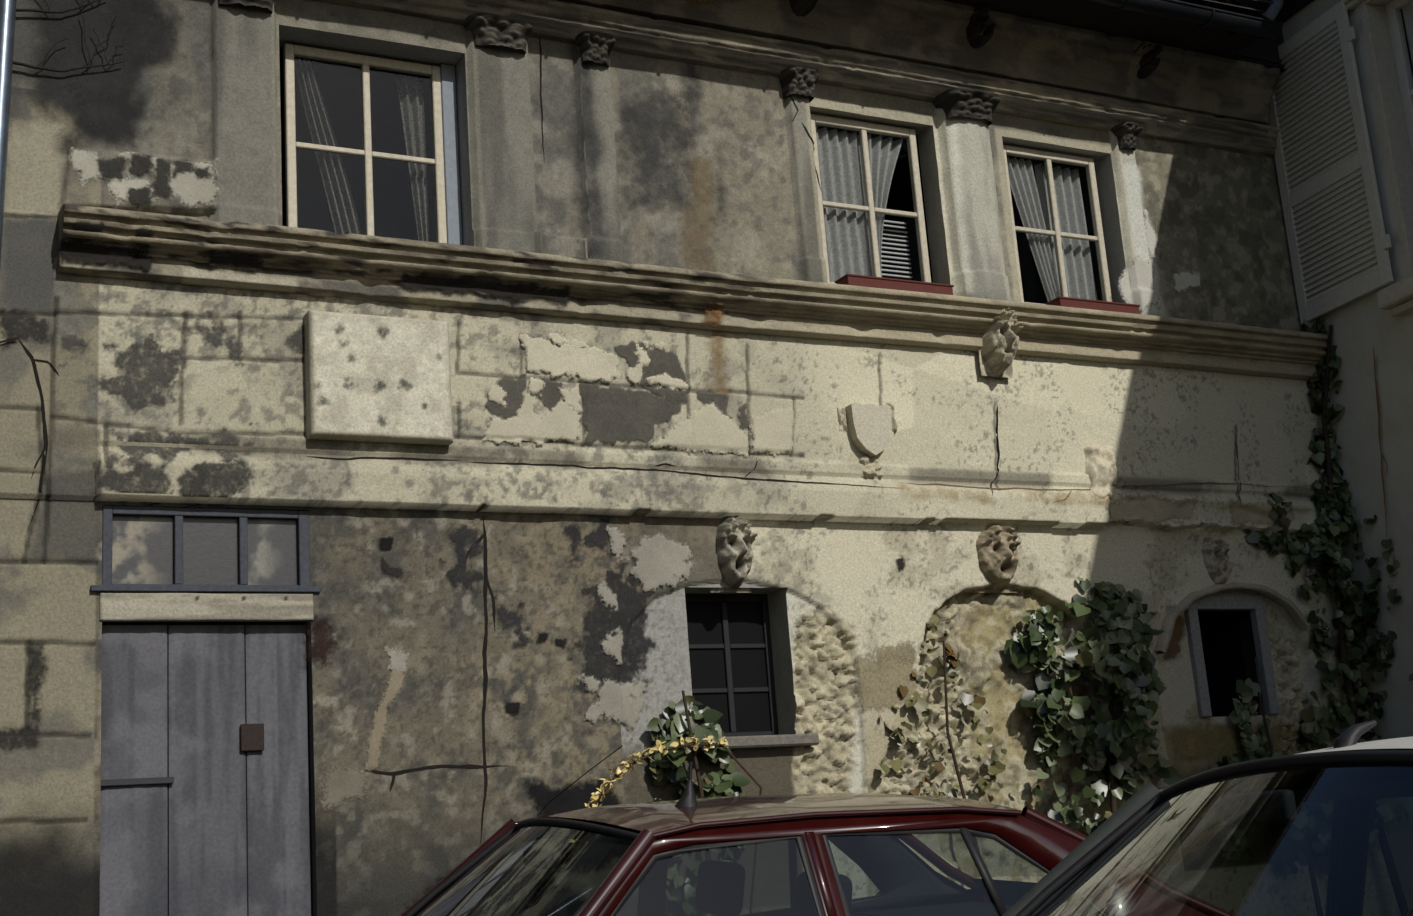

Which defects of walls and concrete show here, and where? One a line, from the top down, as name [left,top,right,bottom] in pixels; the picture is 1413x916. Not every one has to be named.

peeling [68,147,220,209]
water stain [622,98,692,205]
peeling [483,333,688,446]
peeling [651,402,794,457]
spalling [379,537,404,577]
peeling [606,525,693,591]
peeling [597,581,618,611]
spalling [537,633,567,647]
crack [364,515,503,844]
spalling [505,702,520,716]
peeling [578,628,649,730]